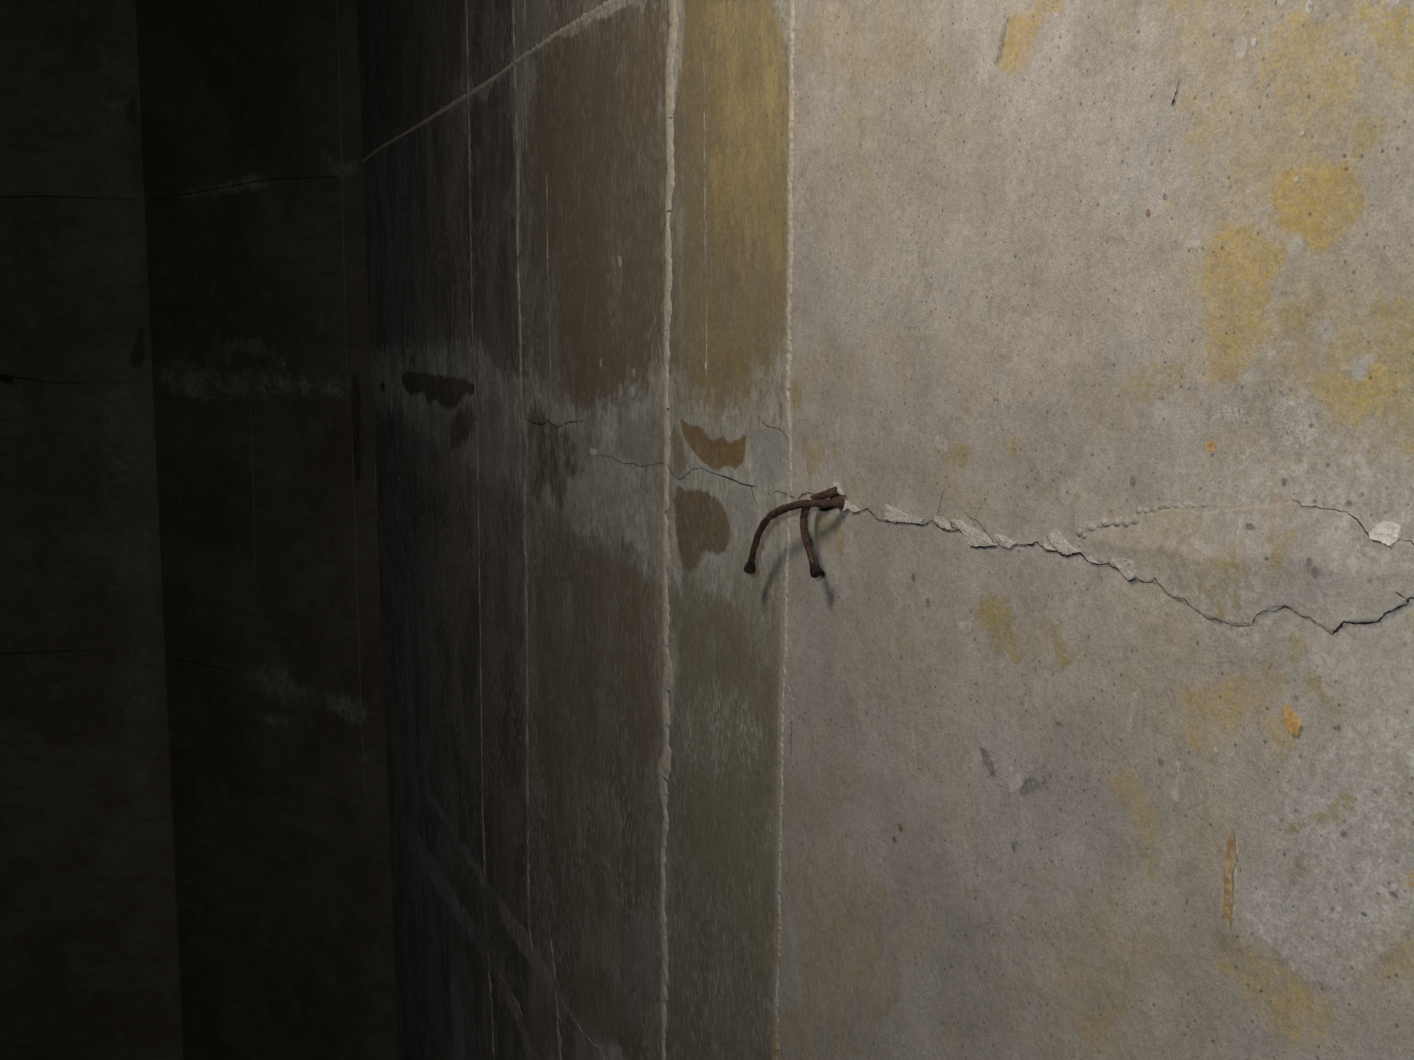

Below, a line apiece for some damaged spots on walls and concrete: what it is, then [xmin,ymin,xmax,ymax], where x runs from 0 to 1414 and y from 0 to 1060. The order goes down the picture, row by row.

leakage [996,0,1062,73]
leakage [1204,115,1414,452]
leakage [325,0,838,1060]
crack [599,455,813,505]
crack [848,491,1414,635]